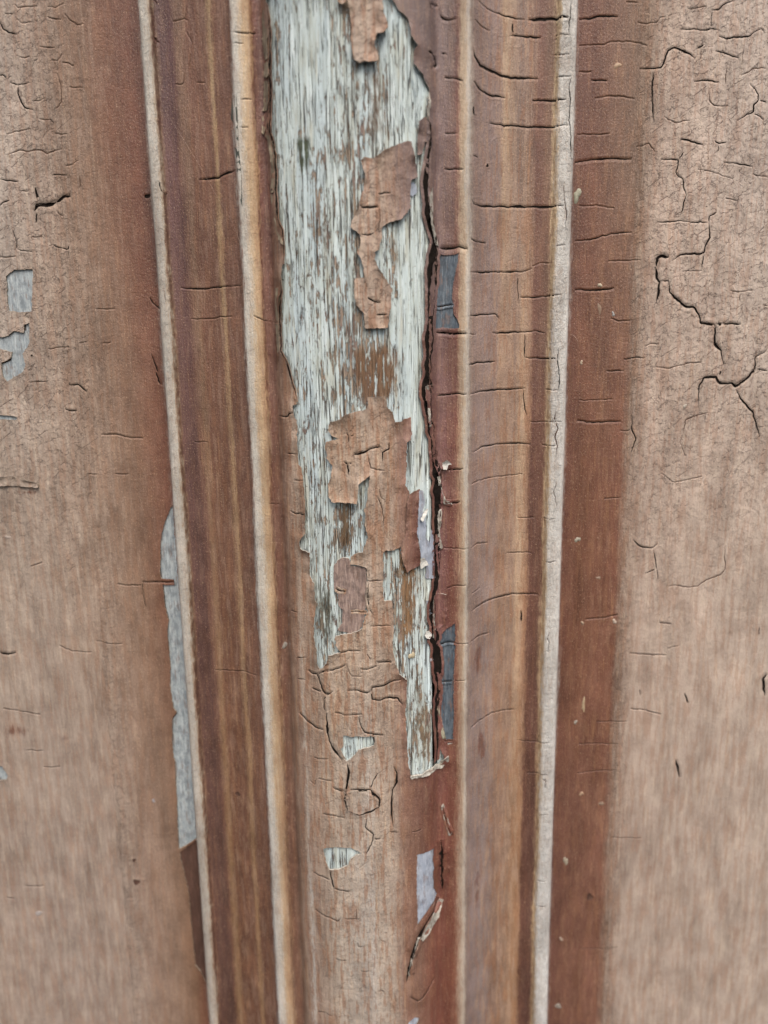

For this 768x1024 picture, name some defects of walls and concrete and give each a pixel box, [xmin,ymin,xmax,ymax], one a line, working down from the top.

crack [0,2,84,260]
crack [143,191,152,202]
peeling [0,269,33,381]
crack [29,379,89,414]
crack [48,340,111,352]
crack [101,431,143,441]
peeling [261,0,459,779]
crack [419,0,768,763]
peeling [161,506,207,983]
crack [297,578,454,1004]
peeling [408,849,443,977]